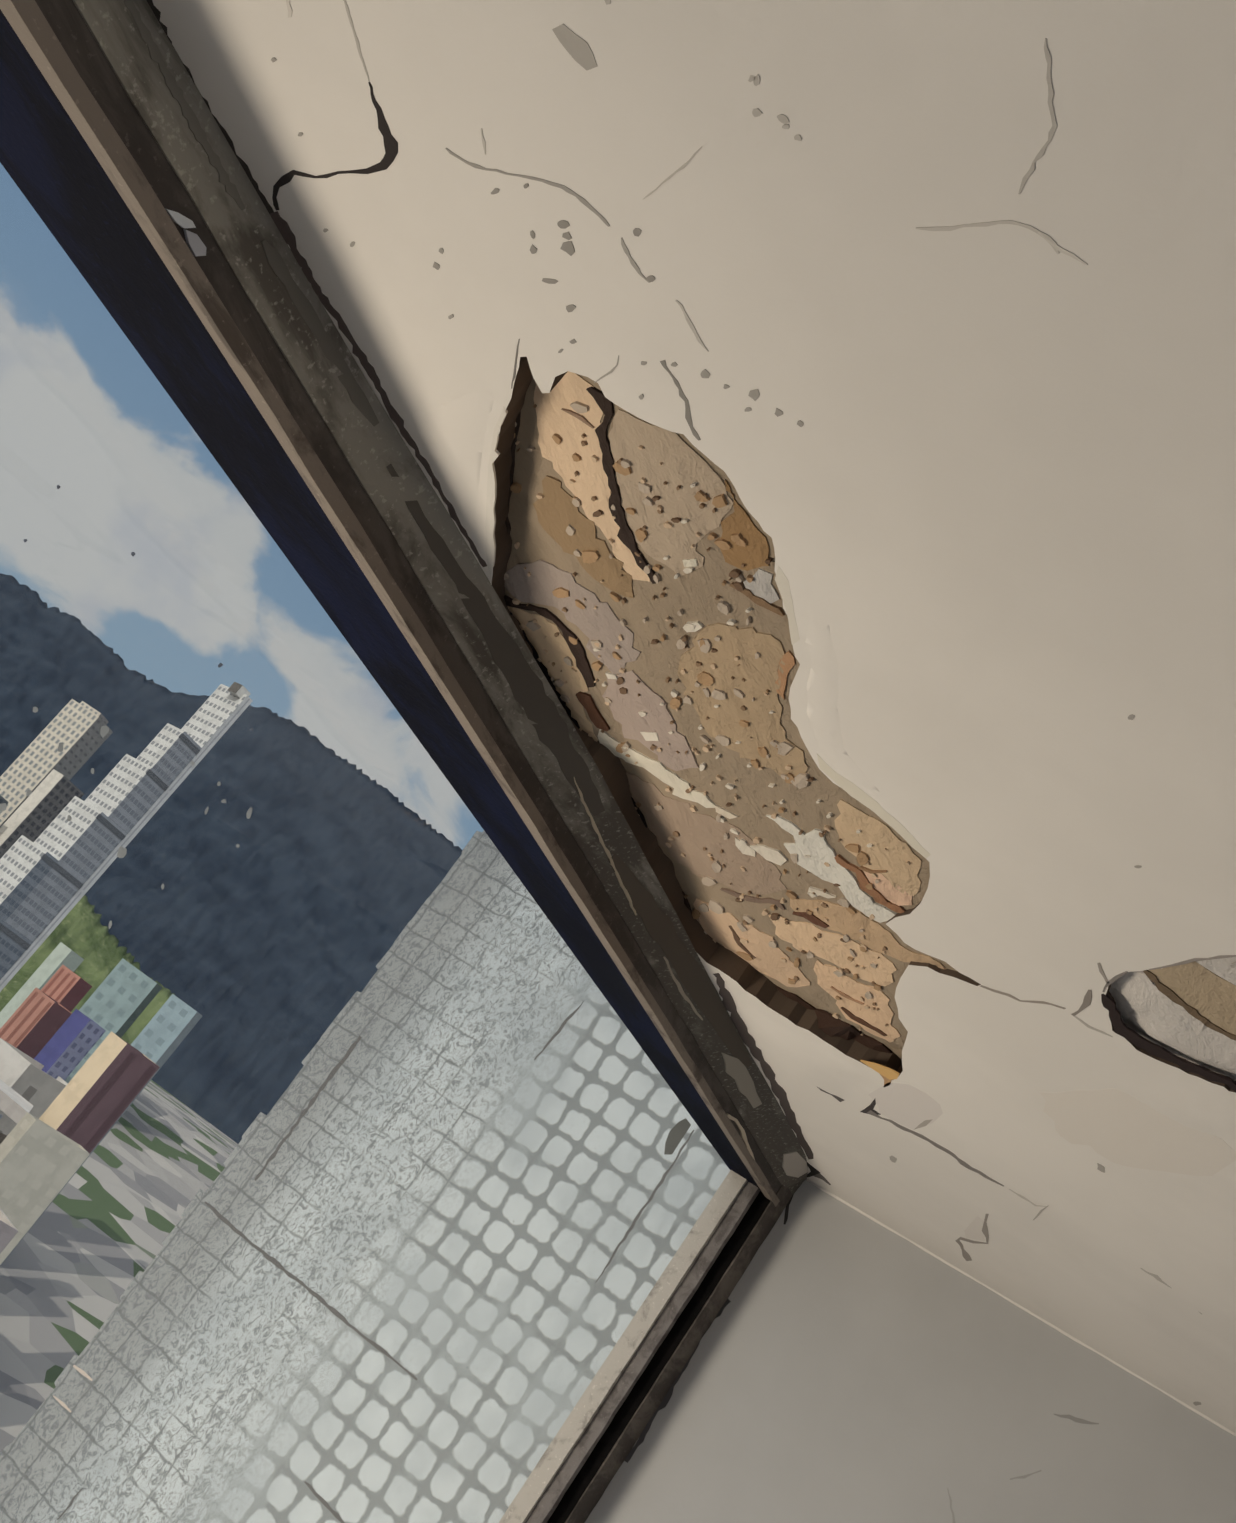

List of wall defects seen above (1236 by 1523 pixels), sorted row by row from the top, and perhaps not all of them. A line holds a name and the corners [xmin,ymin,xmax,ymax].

crack [272,0,398,211]
crack [445,128,708,351]
crack [511,339,520,389]
crack [660,360,701,441]
crack [561,355,656,584]
spalling [405,371,957,1108]
crack [980,955,1236,1041]
spalling [1109,961,1236,1081]
crack [784,1162,831,1224]
crack [818,1087,1049,1261]
crack [1140,1268,1171,1288]